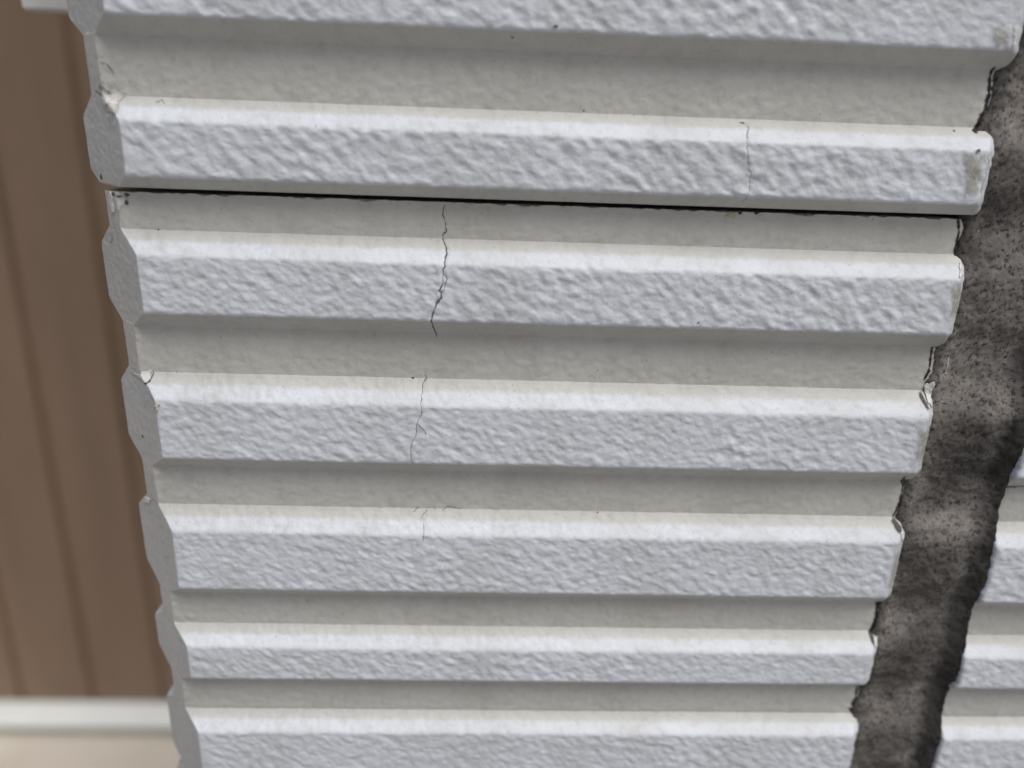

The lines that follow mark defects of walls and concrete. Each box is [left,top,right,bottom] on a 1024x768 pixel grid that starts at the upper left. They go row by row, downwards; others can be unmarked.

peeling [965,148,992,194]
crack [430,206,448,337]
peeling [952,262,964,314]
crack [410,372,427,462]
peeling [919,382,935,410]
peeling [892,518,905,540]